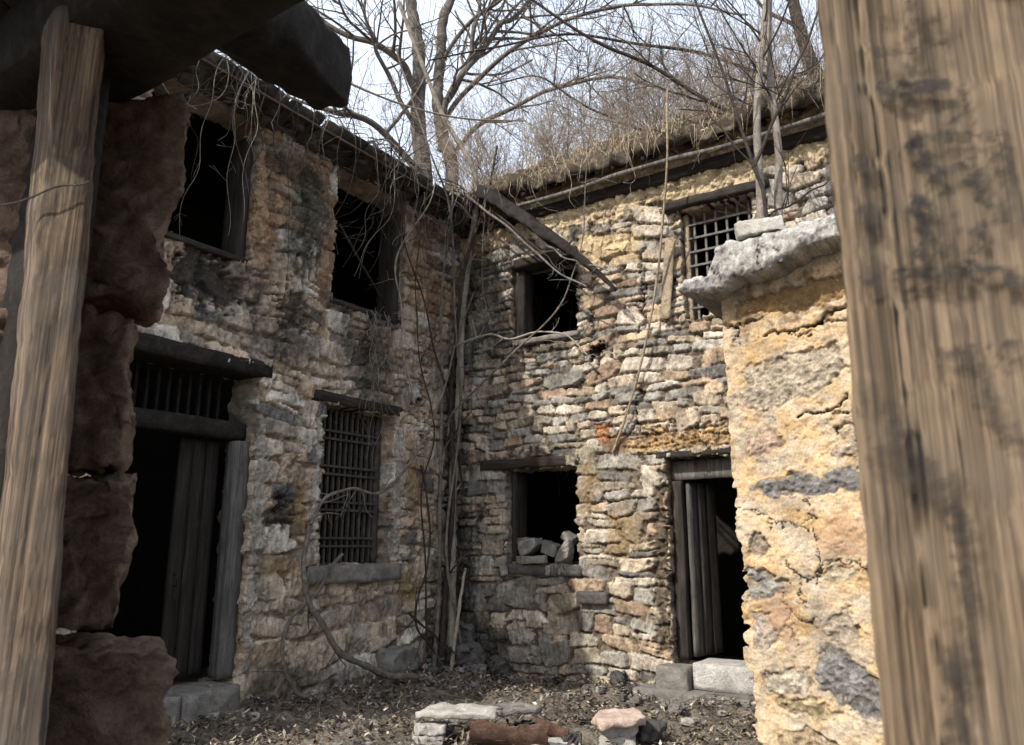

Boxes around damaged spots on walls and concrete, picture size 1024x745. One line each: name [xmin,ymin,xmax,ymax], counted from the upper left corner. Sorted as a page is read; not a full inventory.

spalling [749,442,859,499]
crack [797,397,849,435]
crack [740,498,868,646]
spalling [765,608,882,745]